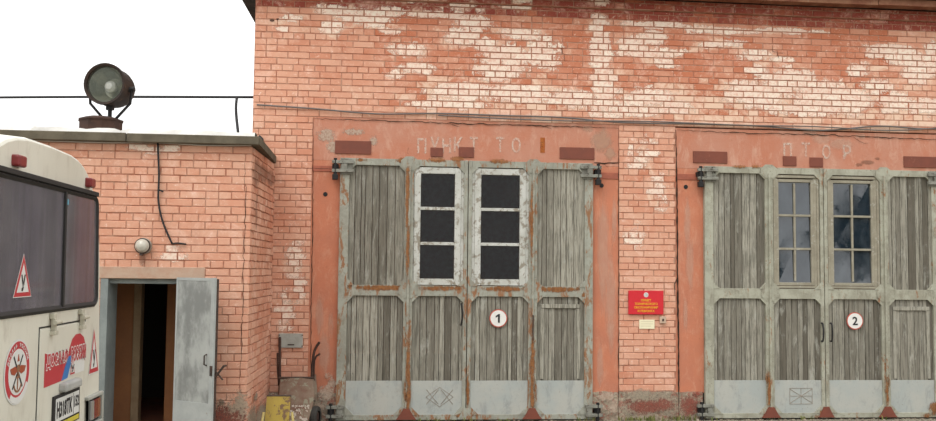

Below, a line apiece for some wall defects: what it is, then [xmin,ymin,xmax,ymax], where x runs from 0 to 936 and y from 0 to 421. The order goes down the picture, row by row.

peeling [276,14,304,32]
peeling [315,0,936,118]
rust [398,158,410,275]
rust [542,287,584,297]
rust [403,340,411,409]
spalling [215,392,266,421]
spalling [598,388,703,416]